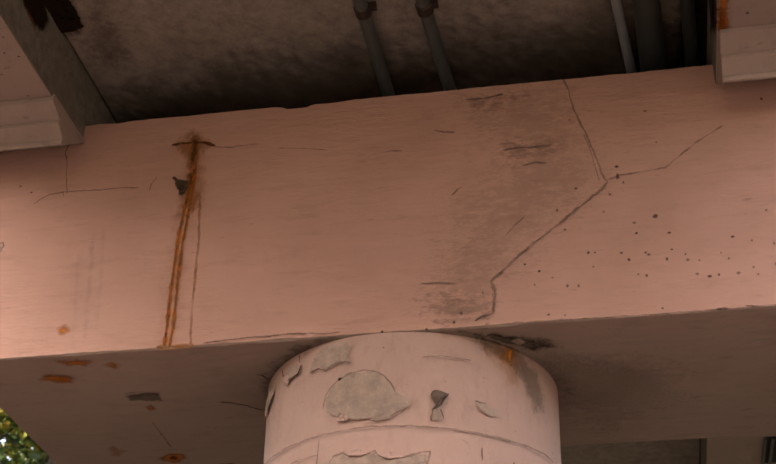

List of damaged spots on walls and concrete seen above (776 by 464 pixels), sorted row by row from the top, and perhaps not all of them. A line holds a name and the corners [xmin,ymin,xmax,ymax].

crack [34,145,157,204]
corrosion [157,138,215,348]
crack [475,173,627,321]
peeling [431,390,449,421]
peeling [326,449,431,464]